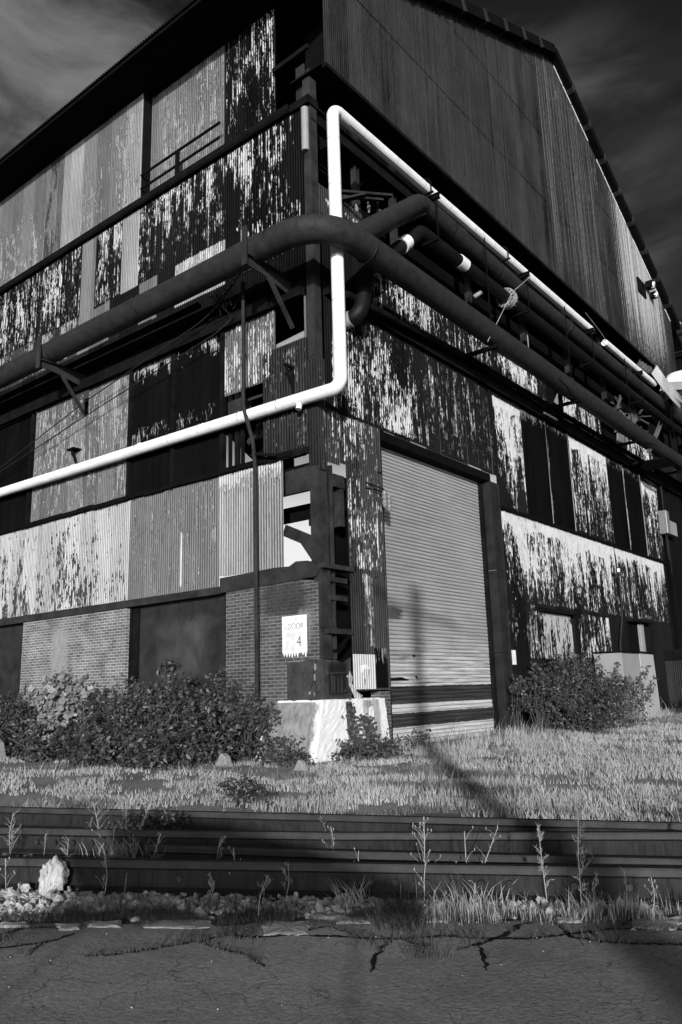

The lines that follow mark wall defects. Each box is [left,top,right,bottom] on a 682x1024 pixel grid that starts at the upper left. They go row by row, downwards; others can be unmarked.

peeling [81,9,301,305]
peeling [0,201,81,366]
peeling [31,310,305,522]
peeling [370,274,546,407]
peeling [322,324,669,687]
crack [200,941,265,967]
crack [329,926,434,973]
crack [478,945,490,971]